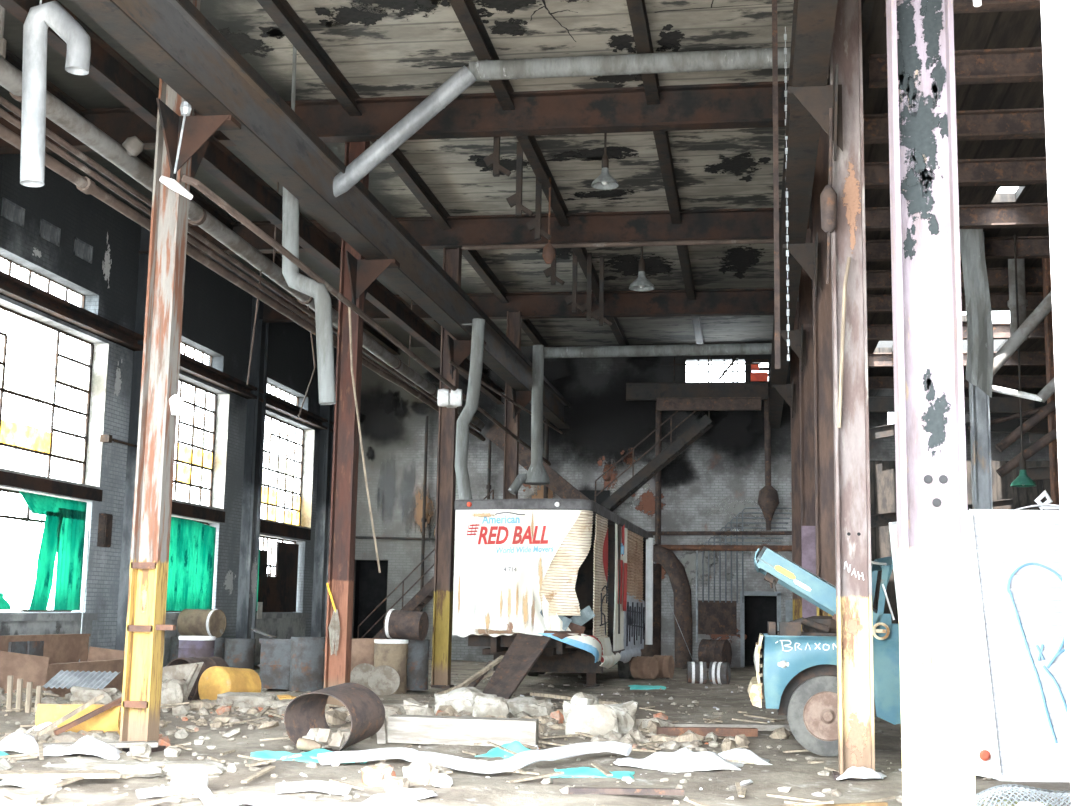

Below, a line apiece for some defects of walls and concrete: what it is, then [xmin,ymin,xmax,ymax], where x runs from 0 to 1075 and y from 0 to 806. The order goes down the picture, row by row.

peeling [314,0,450,28]
peeling [473,0,542,36]
peeling [606,34,636,53]
peeling [656,24,685,52]
peeling [589,74,644,88]
peeling [896,0,948,260]
peeling [545,146,639,161]
peeling [563,189,637,201]
corrosion [841,158,861,254]
peeling [597,254,676,280]
peeling [921,369,952,457]
corrosion [845,713,867,767]